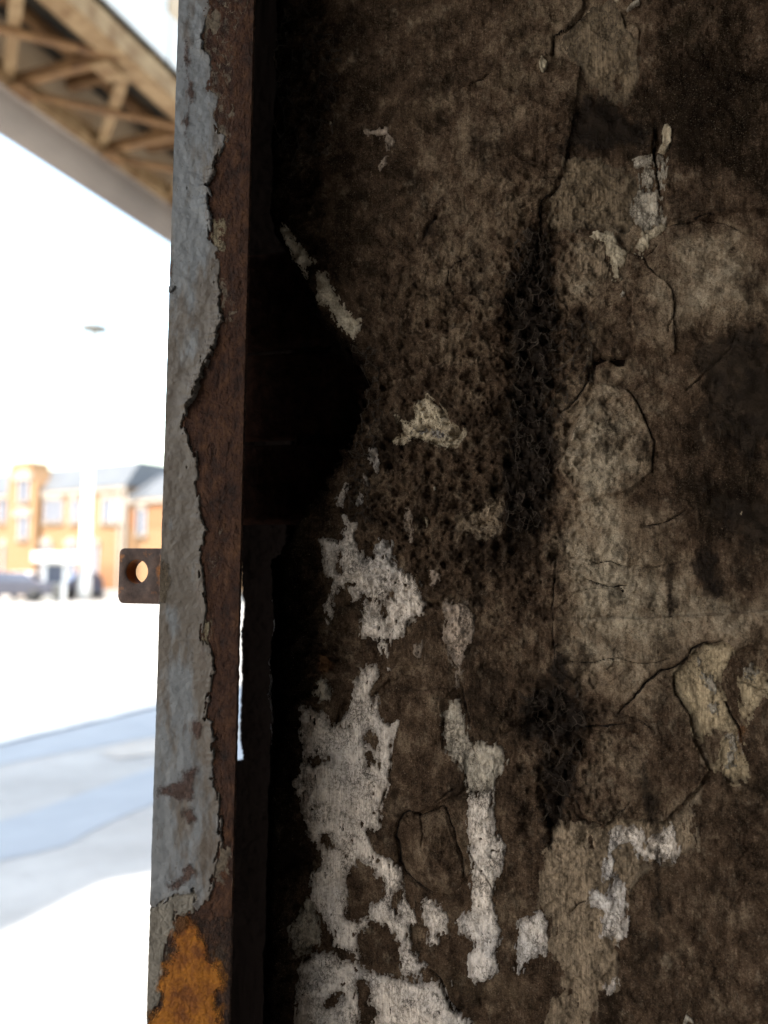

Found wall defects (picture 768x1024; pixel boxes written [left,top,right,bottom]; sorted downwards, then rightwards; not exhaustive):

crack [553,17,582,43]
corrosion [182,41,194,135]
spalling [547,123,672,298]
spalling [218,222,370,534]
spalling [392,393,468,450]
crack [562,366,591,412]
crack [633,396,656,465]
corrosion [191,722,203,739]
peeling [287,447,509,1024]
crack [383,769,471,891]
spalling [513,784,703,1024]
corrosion [149,915,224,1024]